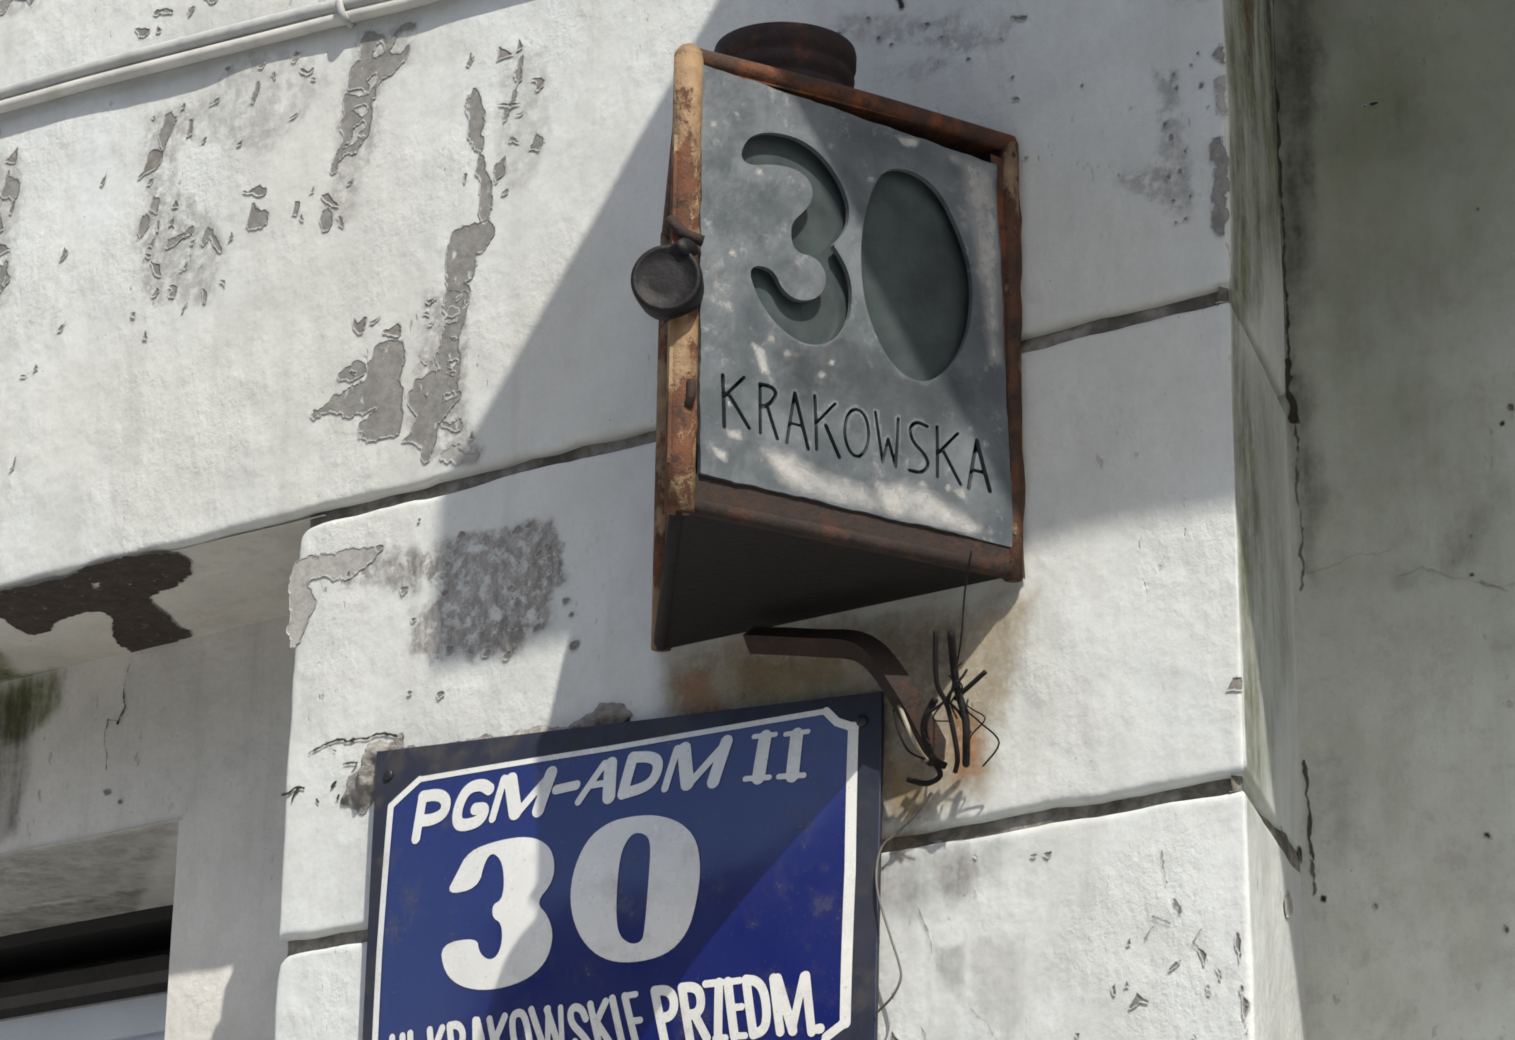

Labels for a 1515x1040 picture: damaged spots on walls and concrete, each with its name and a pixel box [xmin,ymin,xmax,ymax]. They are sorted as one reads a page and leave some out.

peeling [0,147,20,292]
peeling [137,103,269,313]
peeling [292,186,345,232]
peeling [310,21,546,466]
water stain [1230,0,1310,313]
crack [1275,78,1305,591]
peeling [0,552,193,652]
peeling [286,544,384,648]
spalling [340,732,416,815]
spalling [450,703,633,743]
crack [1302,760,1317,895]
spalling [1239,984,1251,1033]